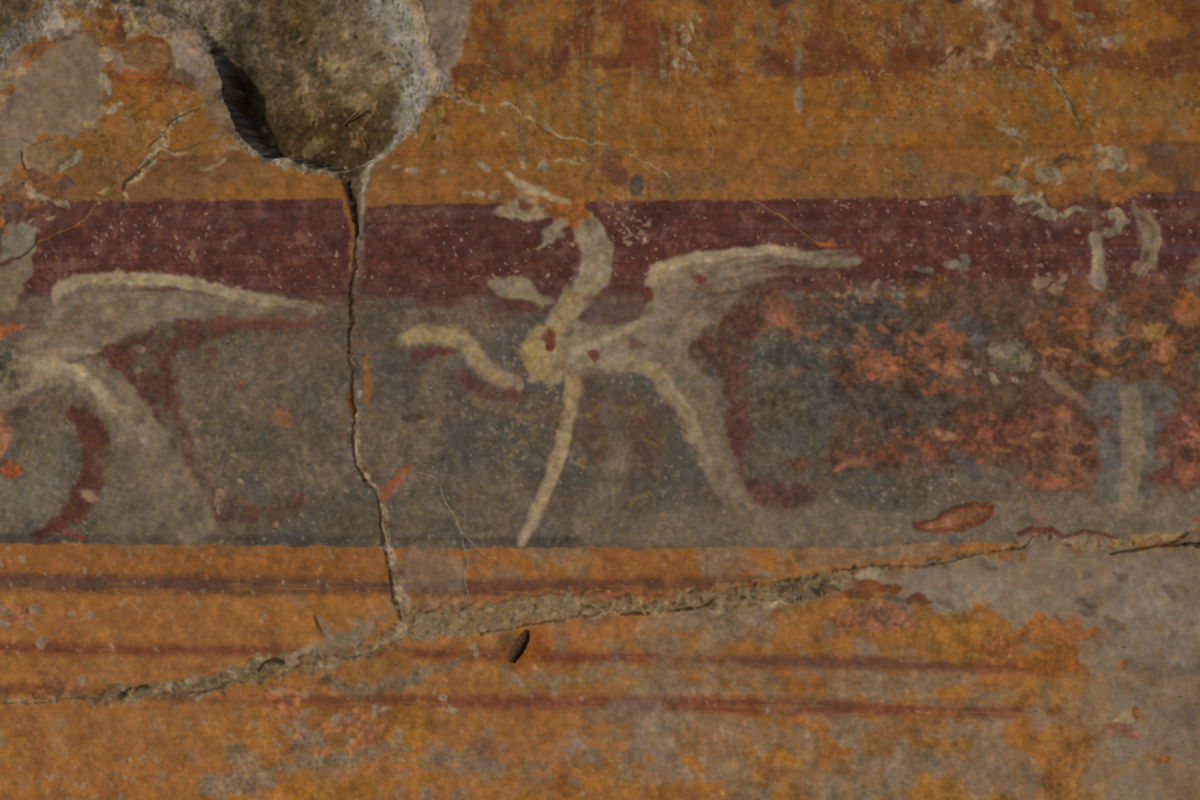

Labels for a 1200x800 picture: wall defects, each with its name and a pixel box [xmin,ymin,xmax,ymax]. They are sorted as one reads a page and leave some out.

crack [0,108,240,269]
spalling [0,0,471,342]
crack [455,98,839,250]
flaking render [838,313,977,395]
peeling [1032,270,1066,297]
flaking render [1043,294,1200,391]
crack [0,156,1200,706]
flaking render [838,403,1119,495]
flaking render [1150,394,1200,493]
flaking render [850,548,1200,800]